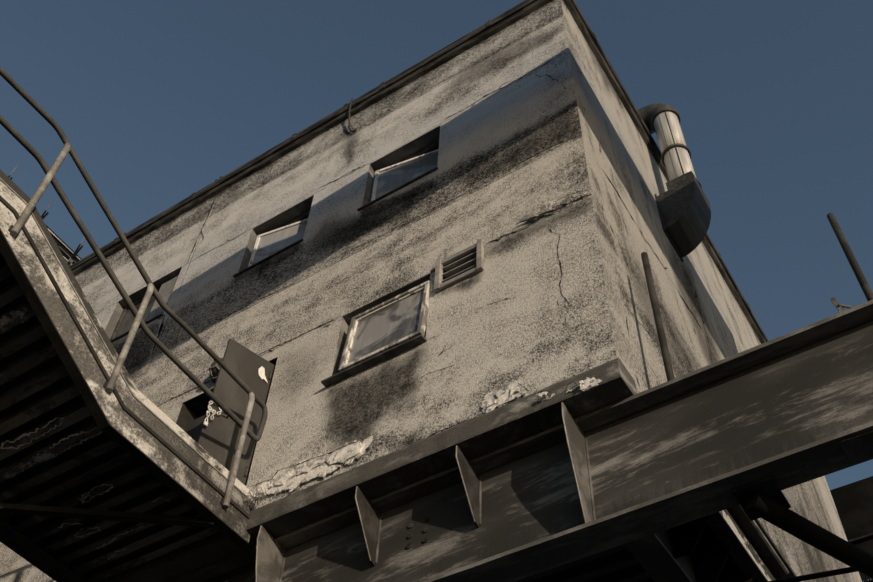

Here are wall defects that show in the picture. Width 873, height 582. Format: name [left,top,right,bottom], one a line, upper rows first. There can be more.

crack [409,15,582,123]
crack [150,137,576,364]
crack [588,175,667,269]
crack [660,287,713,366]
water stain [328,350,420,441]
flaking render [481,380,555,413]
flaking render [565,377,602,393]
flaking render [246,433,377,499]